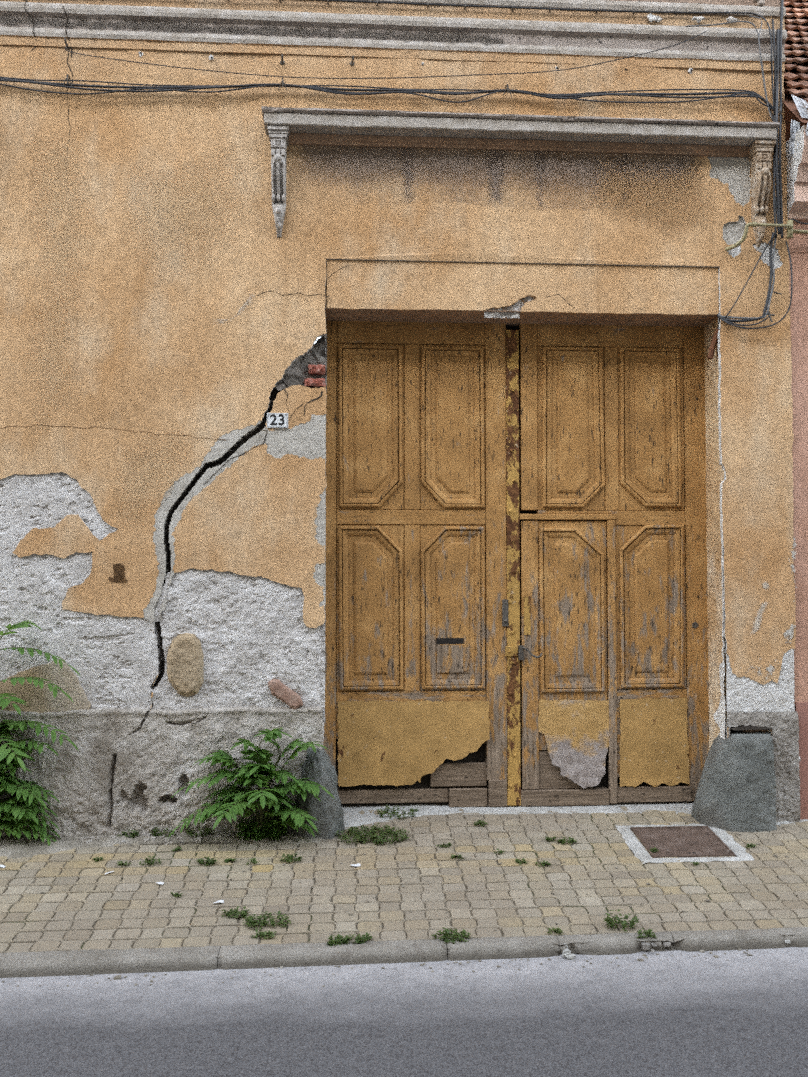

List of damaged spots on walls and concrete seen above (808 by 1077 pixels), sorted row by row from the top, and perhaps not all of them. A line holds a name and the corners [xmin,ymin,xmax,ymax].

crack [110,618,204,825]
spalling [0,414,326,723]
crack [4,381,323,581]
peeling [714,538,796,740]